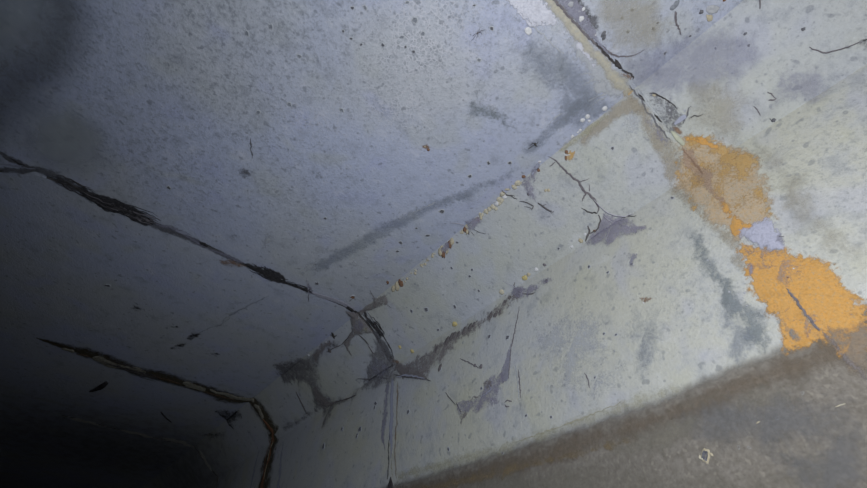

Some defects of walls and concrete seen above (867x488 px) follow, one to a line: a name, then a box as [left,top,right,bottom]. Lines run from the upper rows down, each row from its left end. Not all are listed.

crack [553,0,703,174]
crack [0,152,314,295]
crack [549,157,600,214]
rust [674,134,867,373]
crack [363,311,399,365]
crack [786,288,867,379]